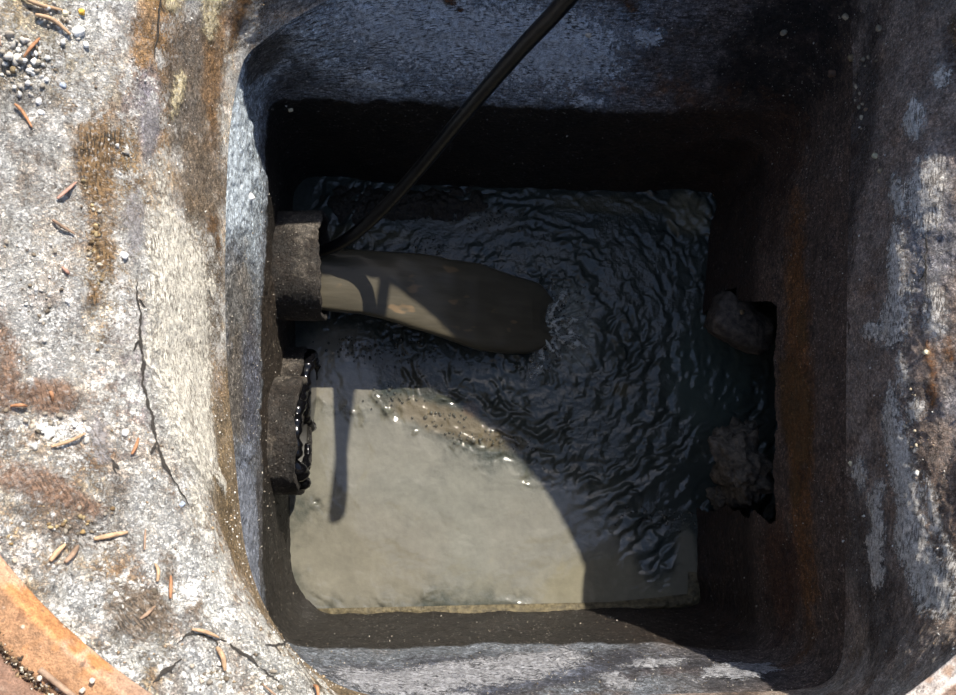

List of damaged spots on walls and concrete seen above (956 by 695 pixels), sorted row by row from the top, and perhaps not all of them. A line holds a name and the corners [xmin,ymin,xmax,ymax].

crack [133,280,189,505]
crack [152,631,288,683]